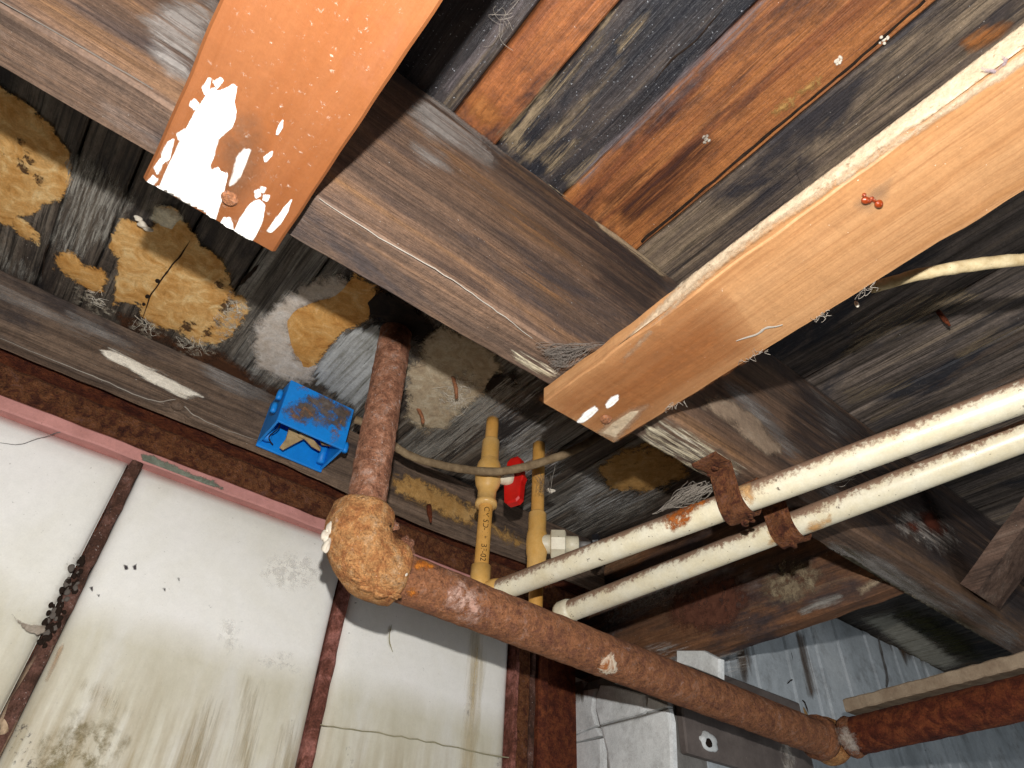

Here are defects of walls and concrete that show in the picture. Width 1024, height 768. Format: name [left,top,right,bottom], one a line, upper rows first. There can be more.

peeling [148,77,292,241]
crack [142,241,190,319]
corrosion [321,322,851,766]